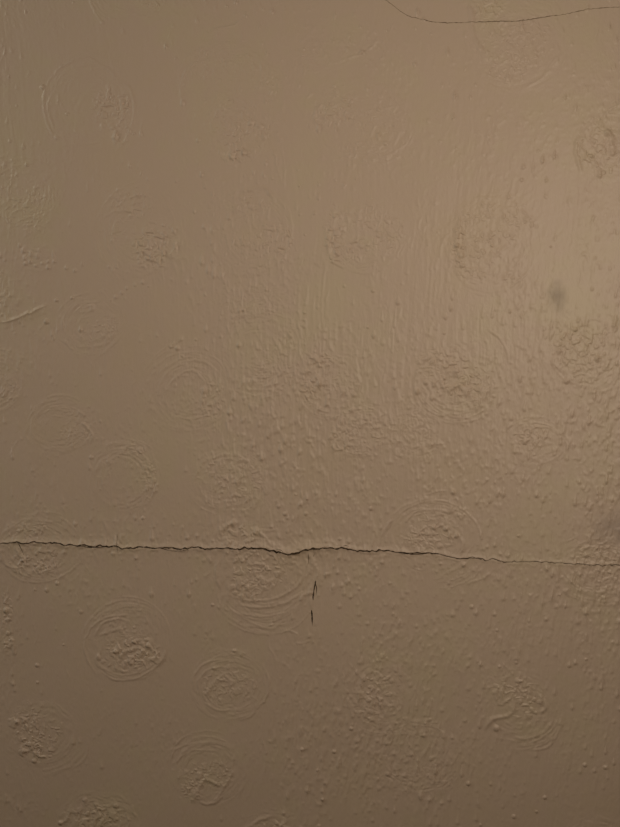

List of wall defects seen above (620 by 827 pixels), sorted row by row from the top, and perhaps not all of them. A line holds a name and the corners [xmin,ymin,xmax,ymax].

crack [0,534,620,625]